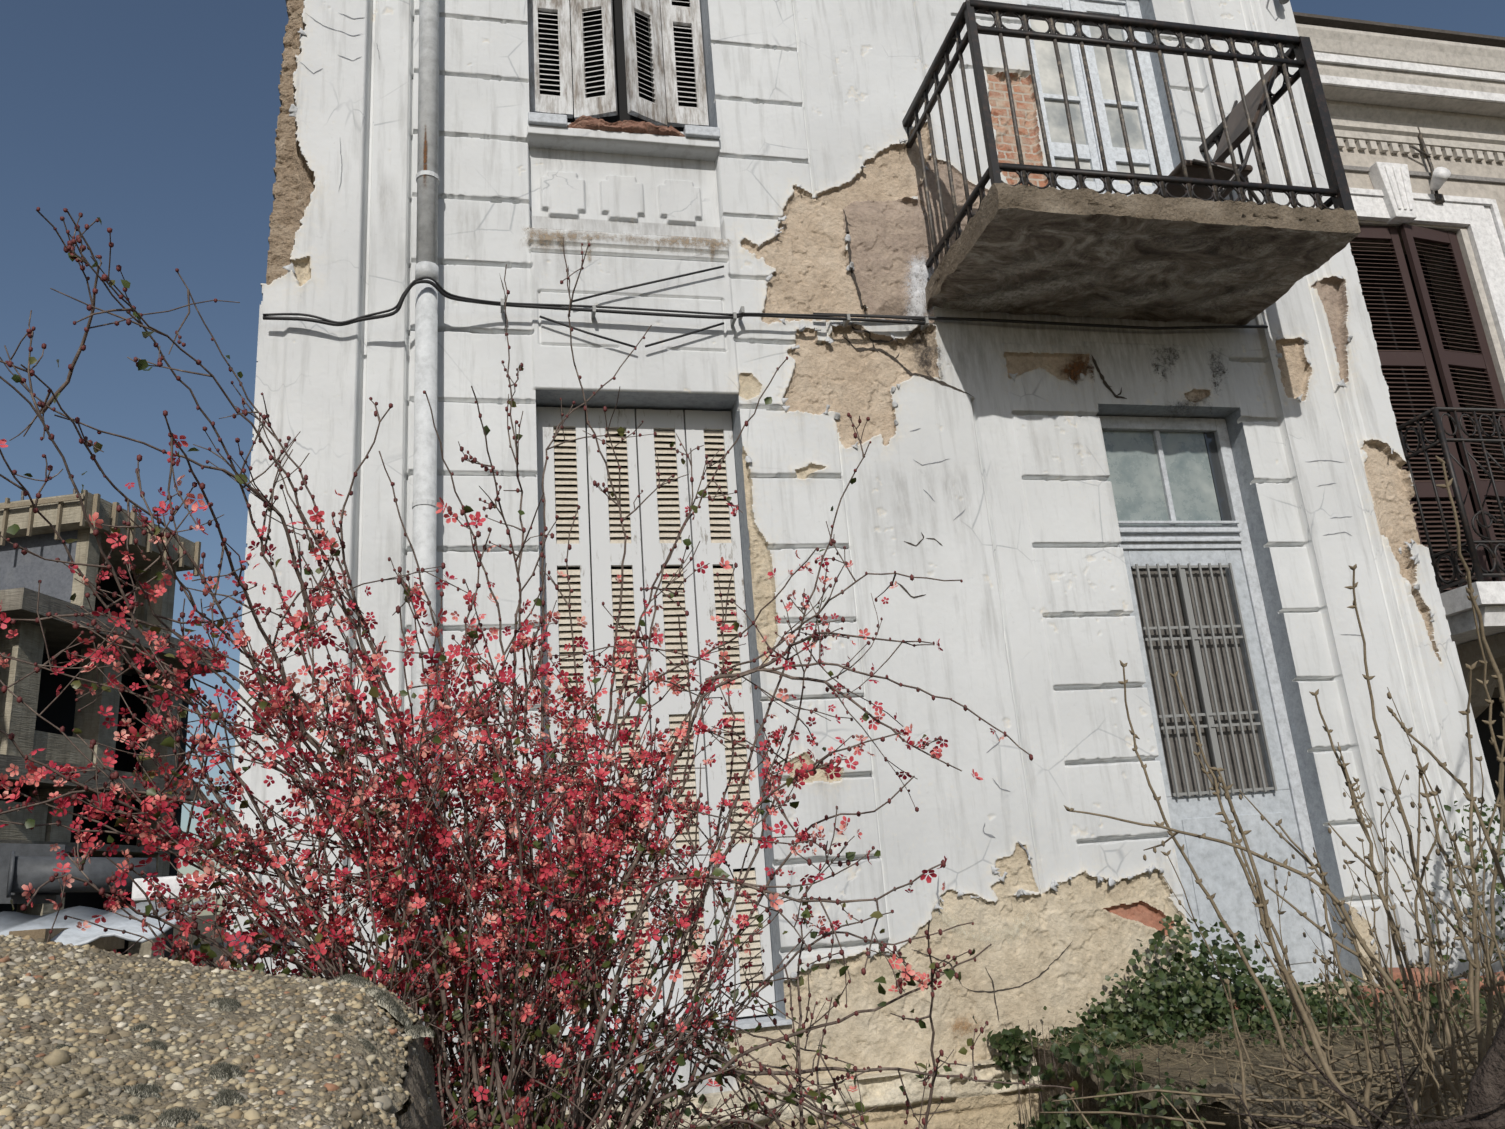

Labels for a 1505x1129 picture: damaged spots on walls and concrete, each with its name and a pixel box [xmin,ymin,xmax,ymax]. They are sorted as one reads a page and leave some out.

spalling [266,0,315,286]
flaking render [987,72,1050,187]
spalling [739,122,940,449]
spalling [1004,352,1090,382]
spalling [1275,336,1312,402]
spalling [1311,276,1353,387]
spalling [742,446,778,668]
spalling [1360,439,1442,662]
spalling [727,842,1193,1088]